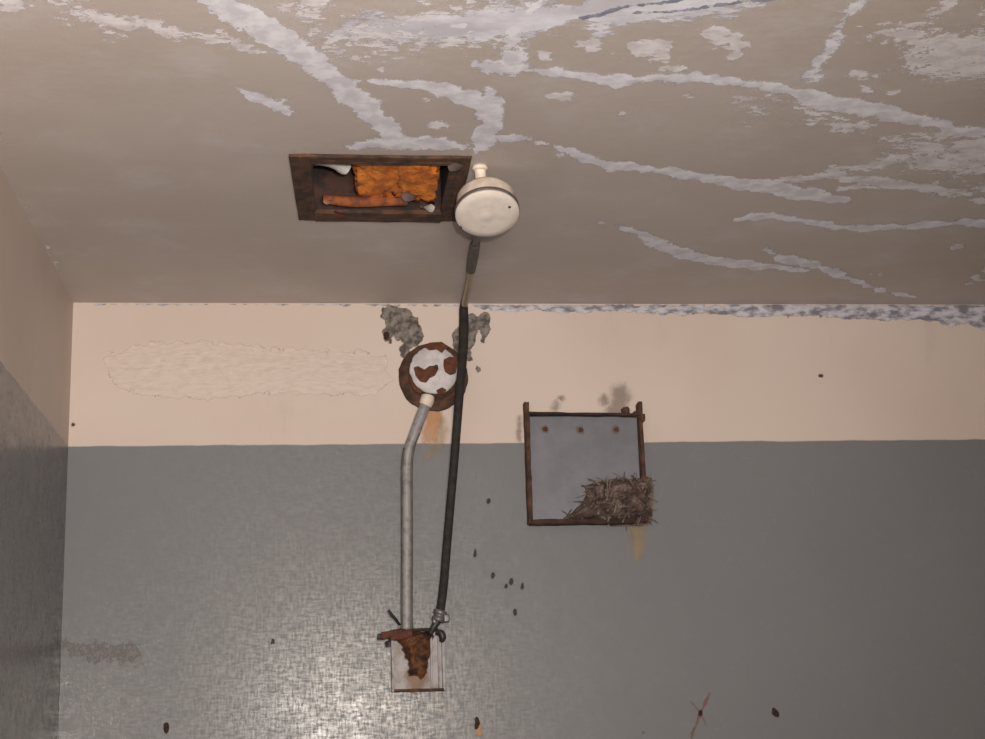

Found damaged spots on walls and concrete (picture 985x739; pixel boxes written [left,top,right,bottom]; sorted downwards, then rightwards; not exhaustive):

peeling [0,0,34,15]
peeling [275,0,777,77]
peeling [799,0,985,89]
spalling [233,85,295,116]
spalling [544,91,575,101]
spalling [425,120,450,131]
peeling [761,94,985,193]
peeling [313,164,351,174]
corrosion [352,165,440,204]
peeling [401,192,435,212]
peeling [365,304,459,358]
peeling [452,304,985,372]